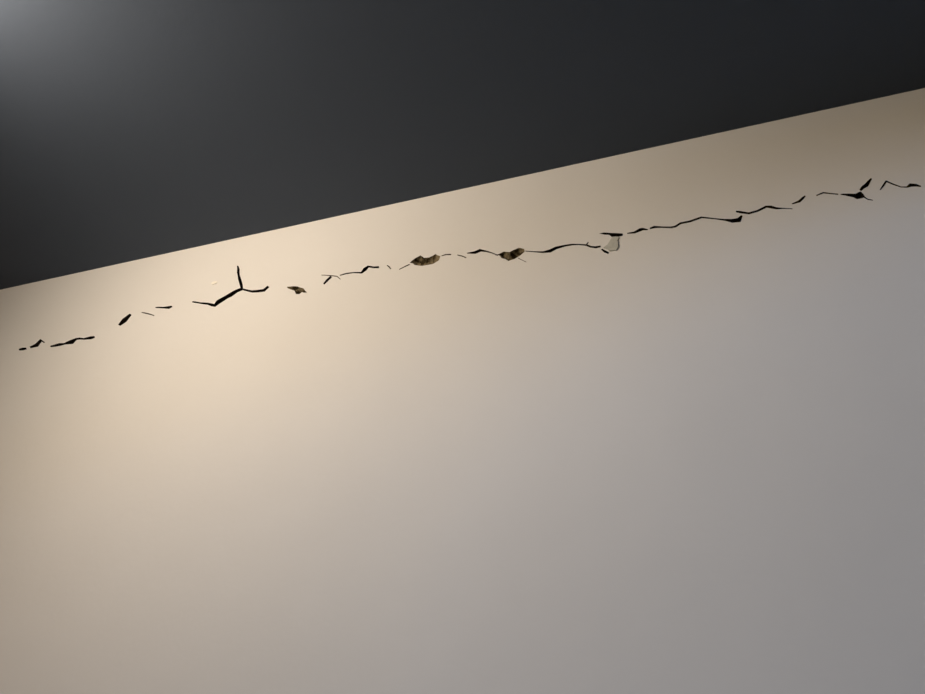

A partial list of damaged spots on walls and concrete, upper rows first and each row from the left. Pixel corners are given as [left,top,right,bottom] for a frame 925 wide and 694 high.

crack [627,178,921,234]
crack [441,249,498,258]
crack [526,242,601,253]
crack [323,264,410,284]
crack [118,266,269,326]
crack [19,336,95,350]